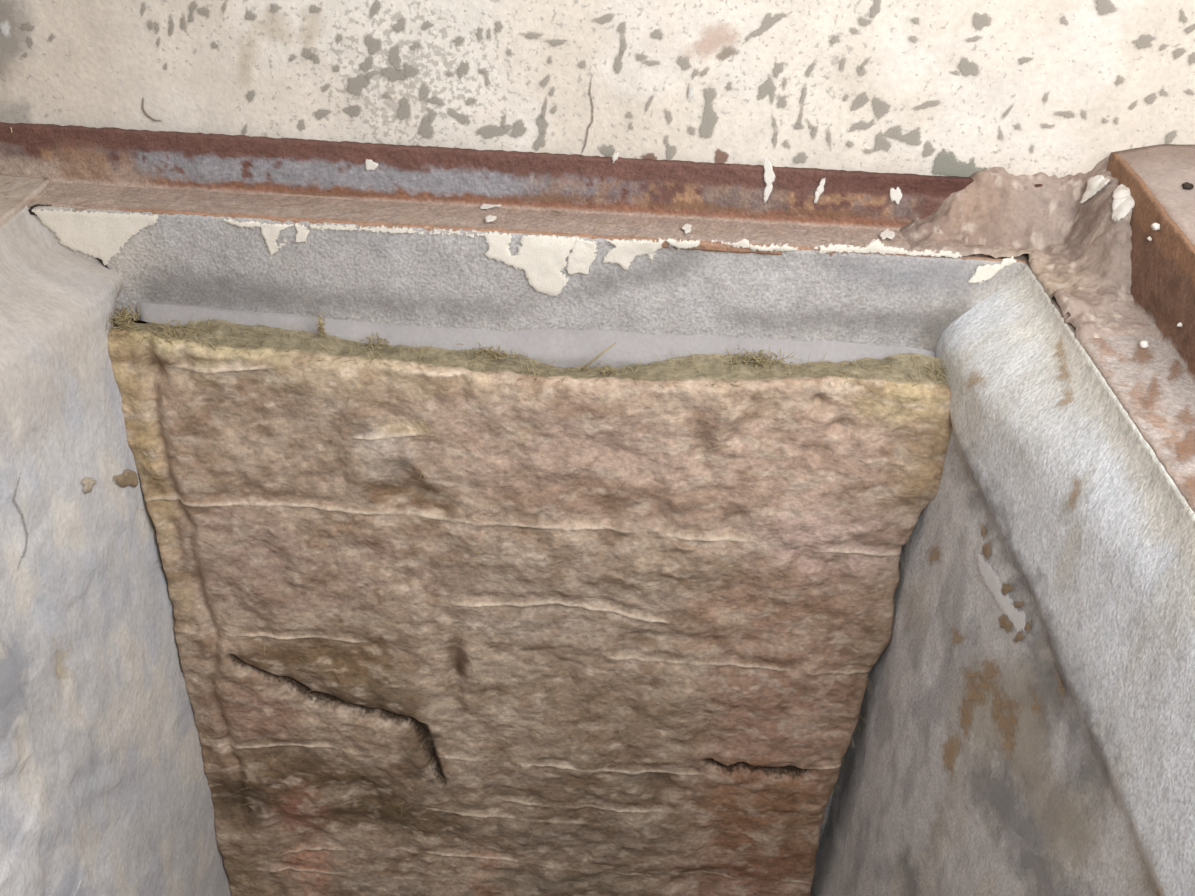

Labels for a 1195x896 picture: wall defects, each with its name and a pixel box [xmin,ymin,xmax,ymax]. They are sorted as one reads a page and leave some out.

flaking render [222,218,962,296]
peeling [968,256,1017,284]
corrosion [943,660,1017,774]